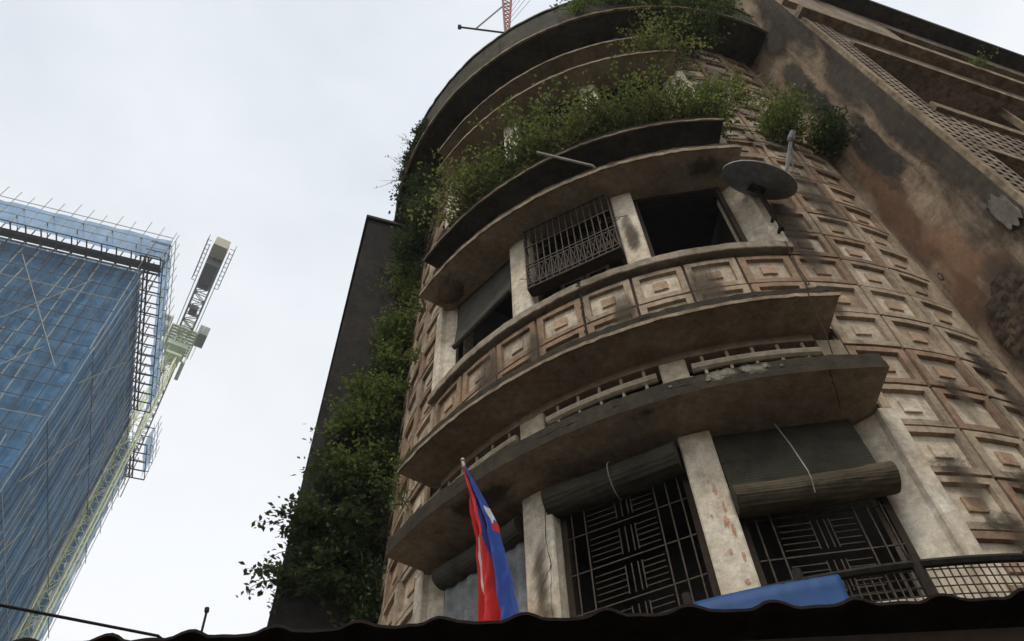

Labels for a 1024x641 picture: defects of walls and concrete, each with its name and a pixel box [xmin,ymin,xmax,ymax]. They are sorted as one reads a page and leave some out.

damp [753,0,1024,253]
flaking render [980,194,1023,230]
damp [624,218,639,248]
damp [772,198,822,268]
spalling [706,363,783,381]